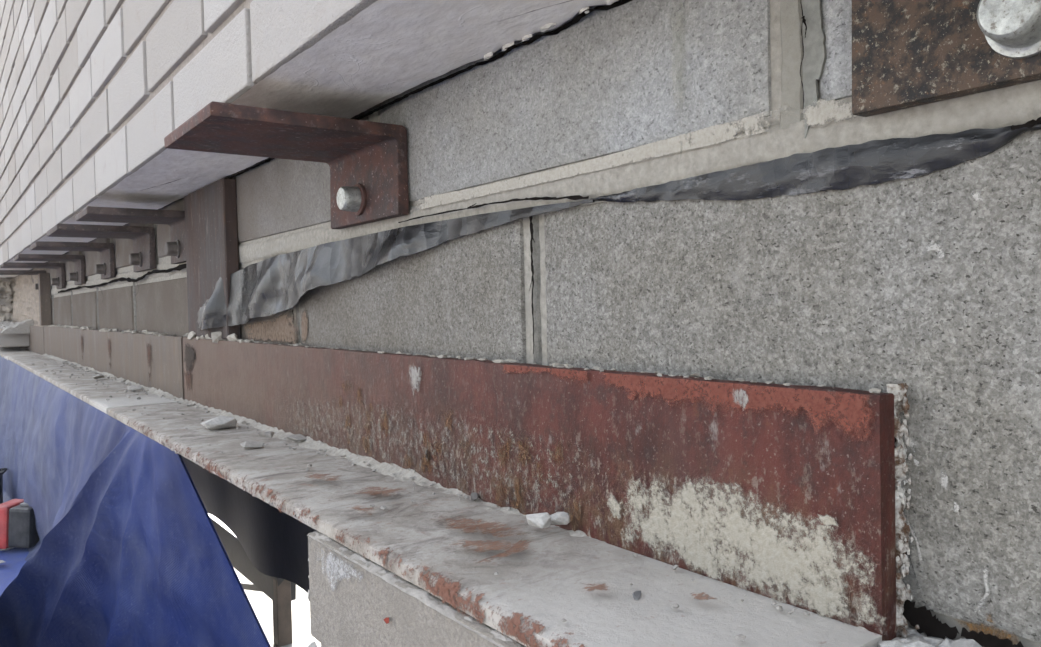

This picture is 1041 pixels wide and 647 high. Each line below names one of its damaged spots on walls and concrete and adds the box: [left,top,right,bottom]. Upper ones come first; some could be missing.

crack [355,0,632,120]
crack [799,2,807,108]
crack [228,158,275,178]
corrosion [127,421,319,523]
corrosion [353,487,403,515]
corrosion [335,528,585,647]
corrosion [438,516,531,563]
damp [280,400,884,624]
corrosion [585,583,608,591]